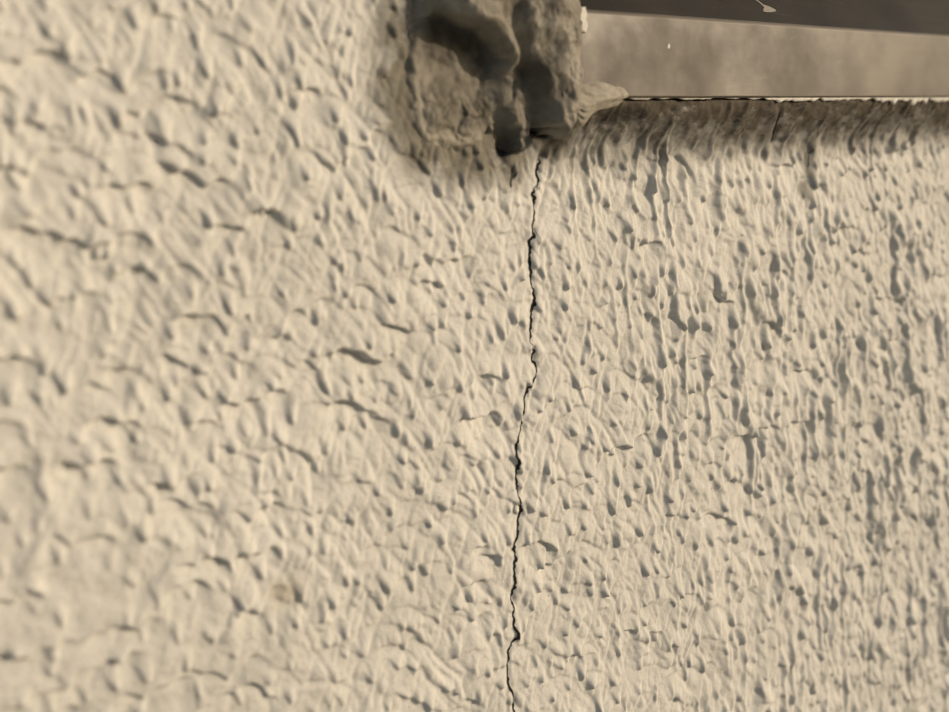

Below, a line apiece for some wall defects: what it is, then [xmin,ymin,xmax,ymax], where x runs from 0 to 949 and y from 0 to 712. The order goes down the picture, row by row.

crack [506,154,542,712]